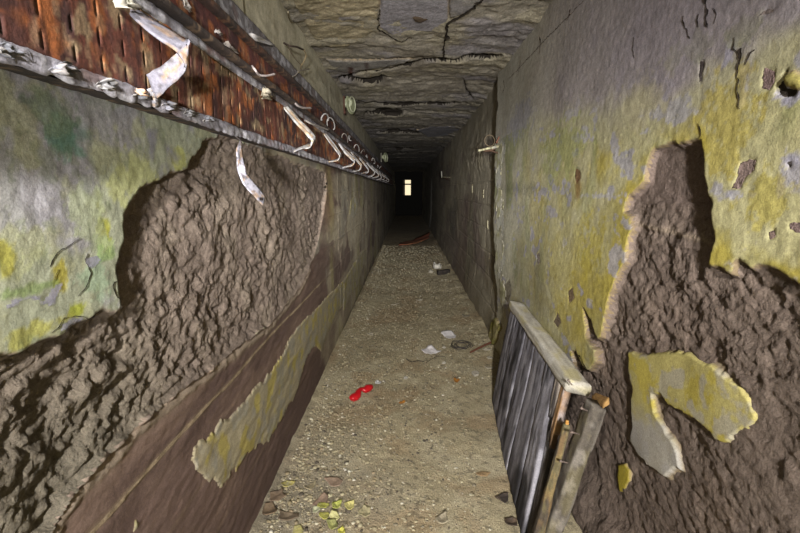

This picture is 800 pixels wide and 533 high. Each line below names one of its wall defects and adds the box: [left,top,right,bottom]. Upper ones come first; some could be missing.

crack [339,0,499,154]
crack [502,4,580,93]
crack [732,36,755,109]
peeling [762,68,800,97]
damp [495,136,505,188]
spalling [0,135,371,533]
spalling [558,142,800,533]